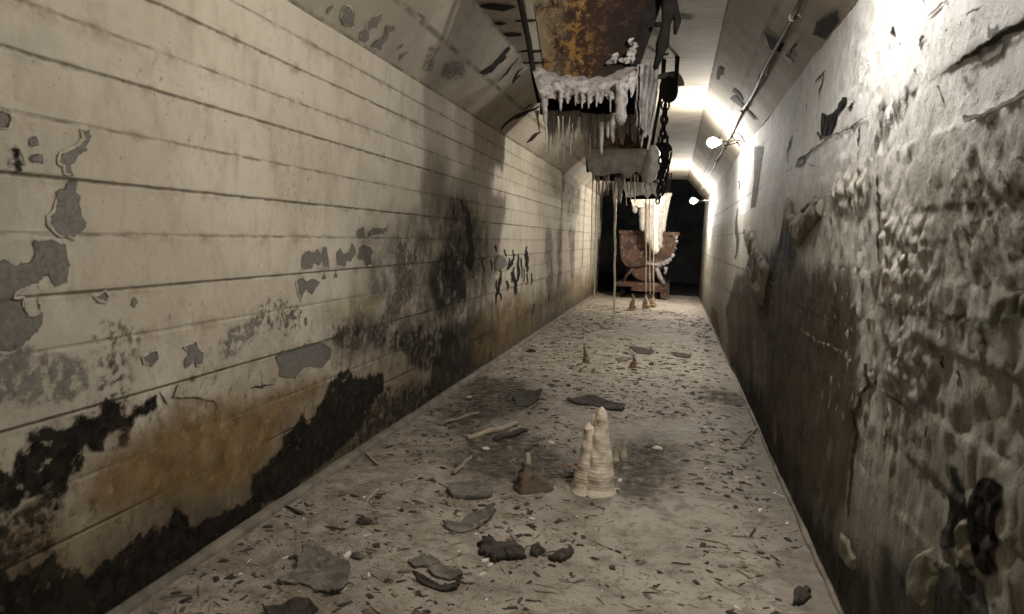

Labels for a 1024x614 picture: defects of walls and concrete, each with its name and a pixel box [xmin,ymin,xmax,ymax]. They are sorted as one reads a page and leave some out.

peeling [327,4,395,51]
crack [926,0,984,32]
crack [955,21,1024,65]
peeling [0,110,12,130]
spalling [821,97,853,137]
crack [962,90,1024,121]
peeling [0,128,91,353]
peeling [296,227,387,301]
peeling [276,342,332,379]
damp [0,209,533,614]
damp [726,244,907,614]